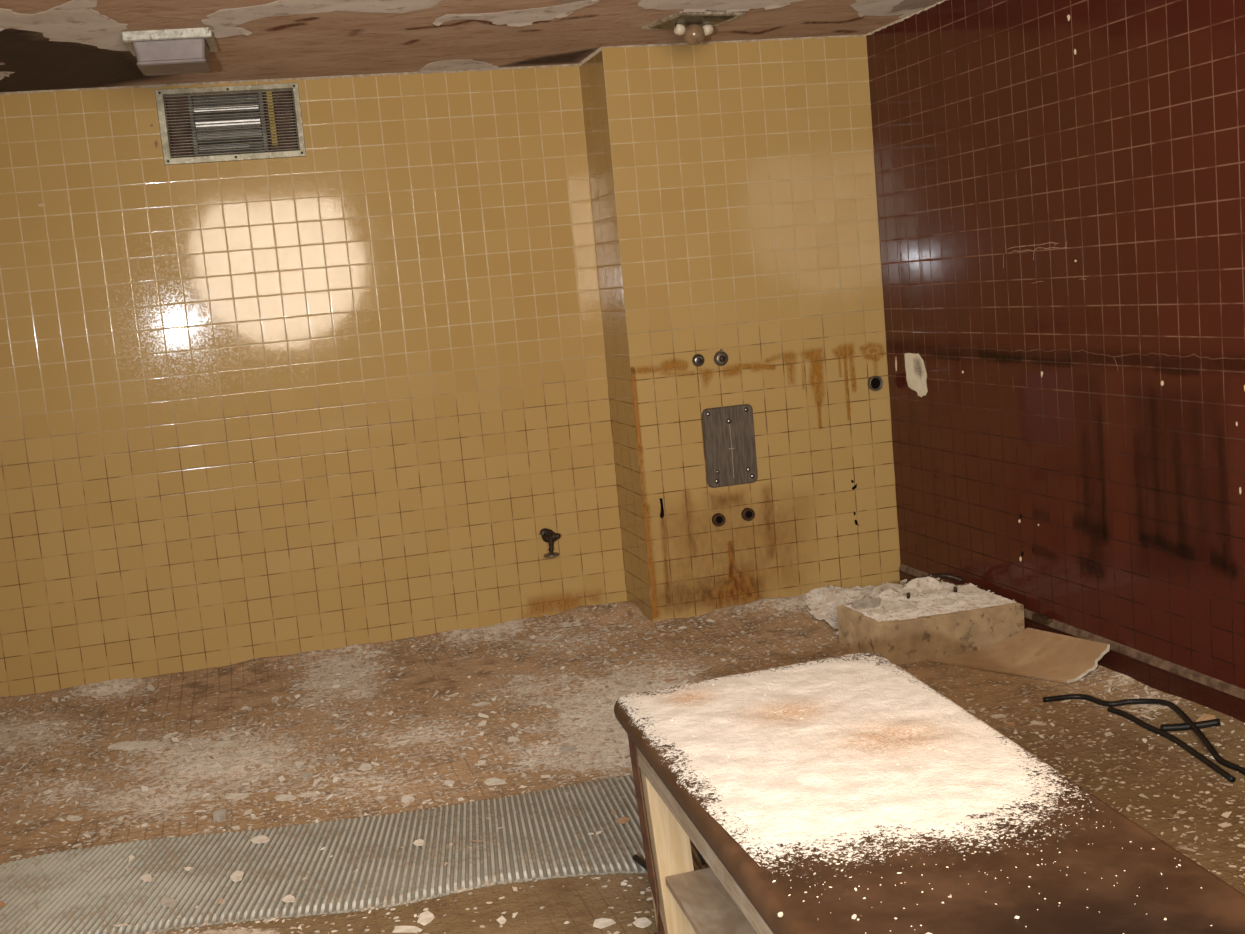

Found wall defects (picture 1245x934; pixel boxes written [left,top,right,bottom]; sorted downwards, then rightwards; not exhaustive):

peeling [0,0,129,51]
peeling [201,0,600,38]
peeling [638,0,803,13]
peeling [851,0,943,20]
peeling [417,59,500,73]
corrosion [727,351,822,428]
corrosion [631,360,687,618]
corrosion [717,541,757,604]